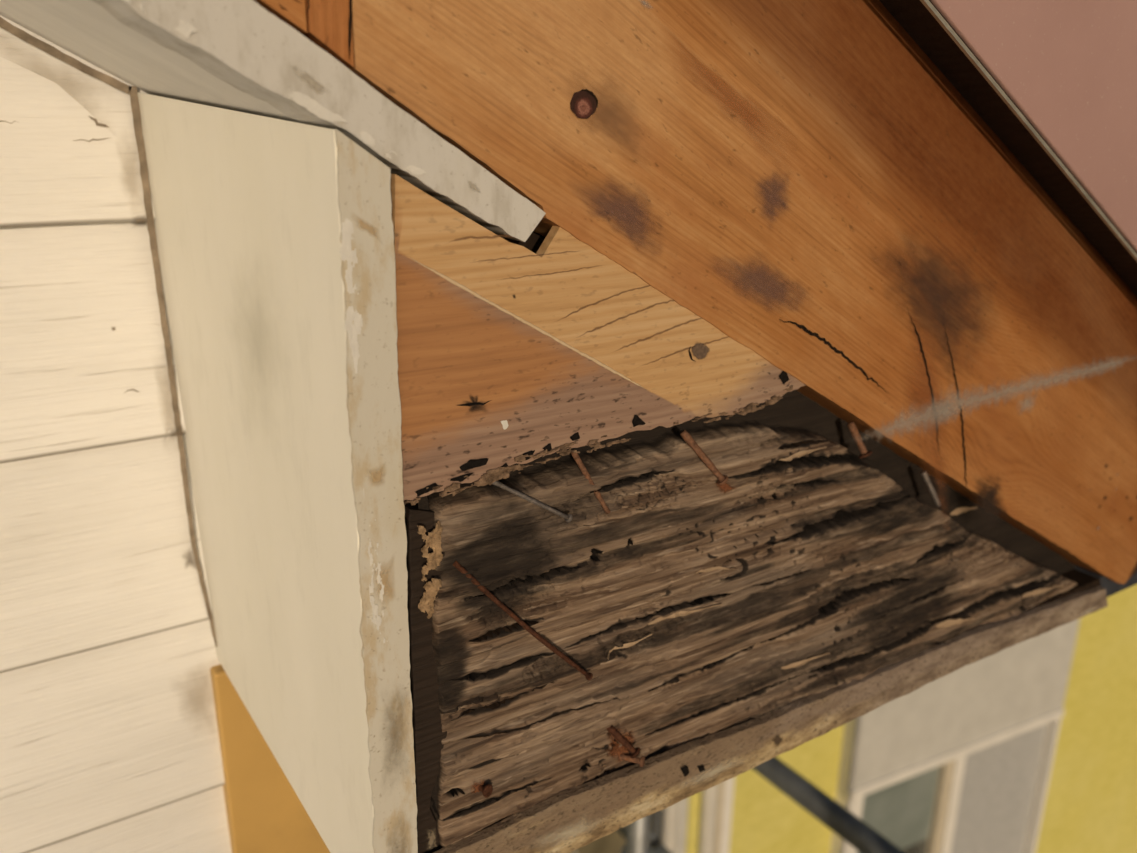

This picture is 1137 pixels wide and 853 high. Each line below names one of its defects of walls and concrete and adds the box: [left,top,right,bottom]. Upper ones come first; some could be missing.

peeling [289,91,348,123]
peeling [359,131,375,146]
peeling [406,165,427,176]
peeling [340,218,363,374]
crack [780,319,888,393]
crack [909,314,967,488]
spalling [415,473,473,497]
peeling [367,519,388,643]